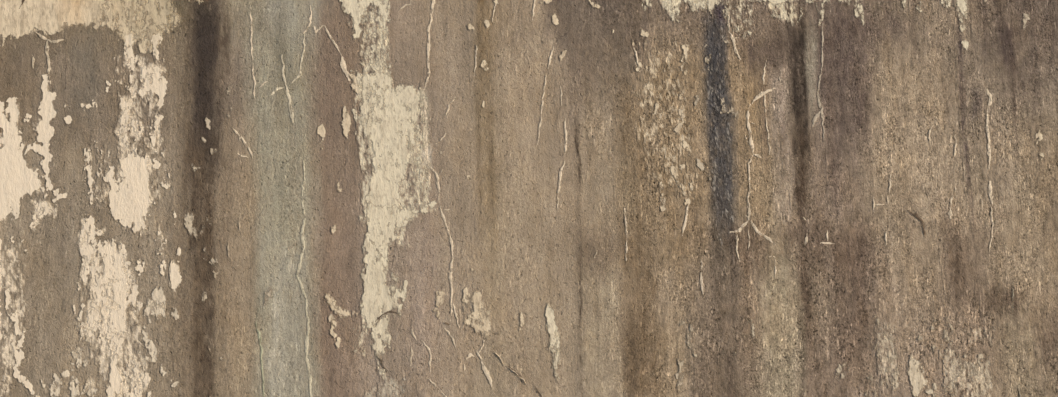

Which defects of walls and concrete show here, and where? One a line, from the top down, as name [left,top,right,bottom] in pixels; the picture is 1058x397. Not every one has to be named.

peeling [0,0,218,397]
damp [168,0,335,397]
crack [249,5,350,397]
peeling [323,0,438,397]
damp [538,0,925,397]
peeling [630,0,865,252]
peeling [941,0,969,50]
damp [936,0,1058,383]